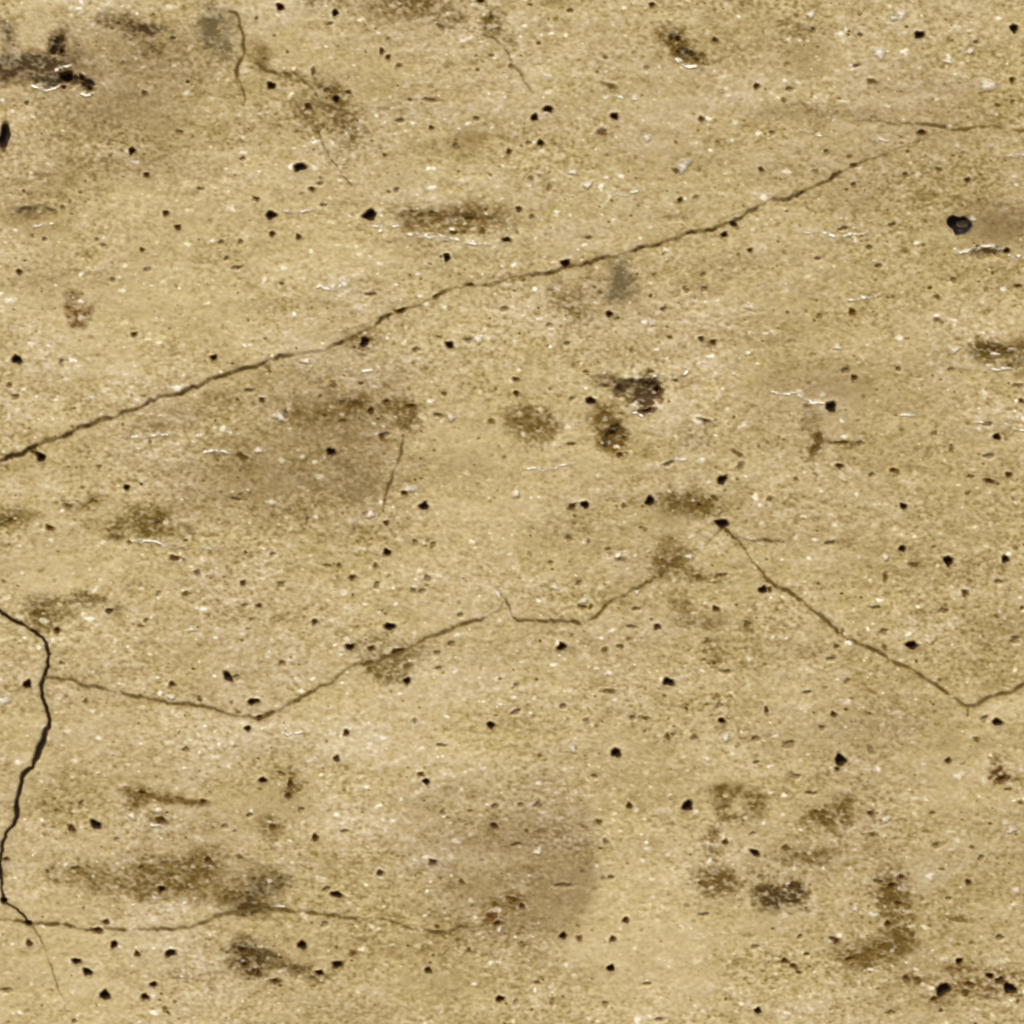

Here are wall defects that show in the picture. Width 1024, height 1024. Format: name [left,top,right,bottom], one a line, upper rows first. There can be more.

damp [0,30,94,91]
damp [401,205,503,233]
crack [433,159,867,299]
crack [329,307,409,348]
crack [0,354,293,462]
damp [599,375,663,414]
crack [505,578,654,625]
crack [720,528,1024,711]
crack [0,609,490,937]
damp [76,852,287,917]
damp [754,880,808,911]
damp [839,876,914,967]